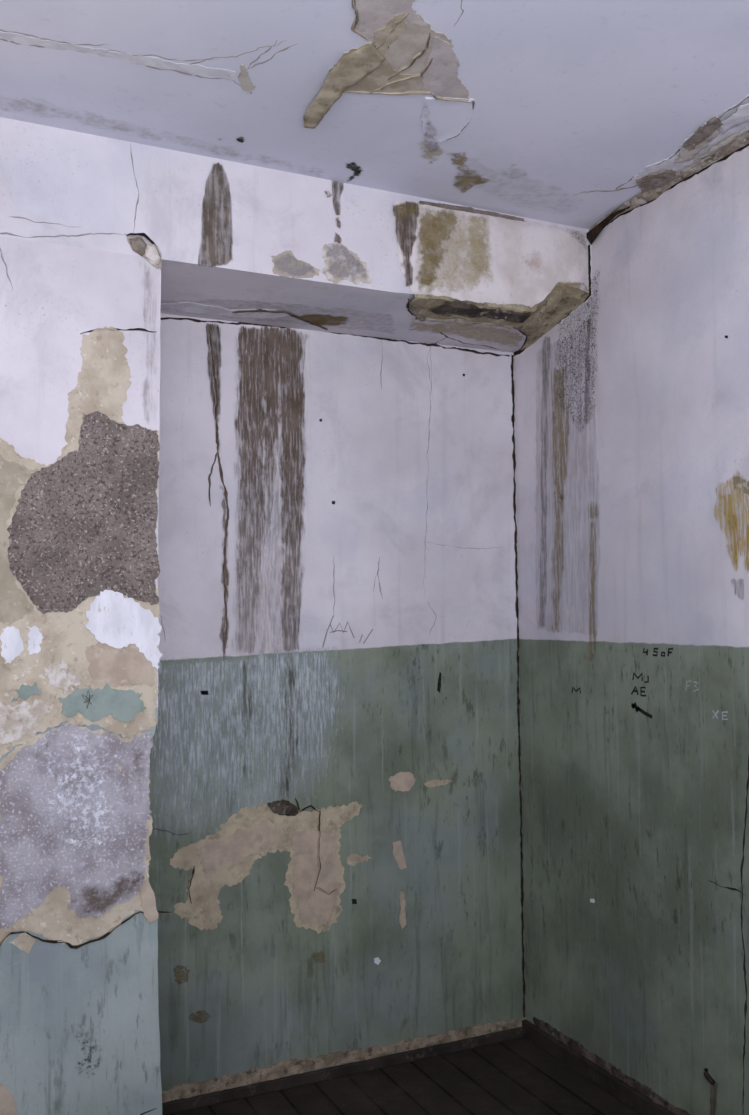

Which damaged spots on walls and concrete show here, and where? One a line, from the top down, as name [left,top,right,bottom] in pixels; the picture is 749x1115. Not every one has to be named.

crack [0,29,297,94]
peeling [303,0,475,152]
water stain [198,163,232,267]
water stain [393,202,487,286]
flaking render [589,95,749,231]
spalling [409,285,589,351]
water stain [555,272,600,429]
water stain [235,327,306,630]
water stain [715,477,749,596]
flaking render [0,326,163,954]
spalling [388,772,452,792]
peeling [170,798,372,934]